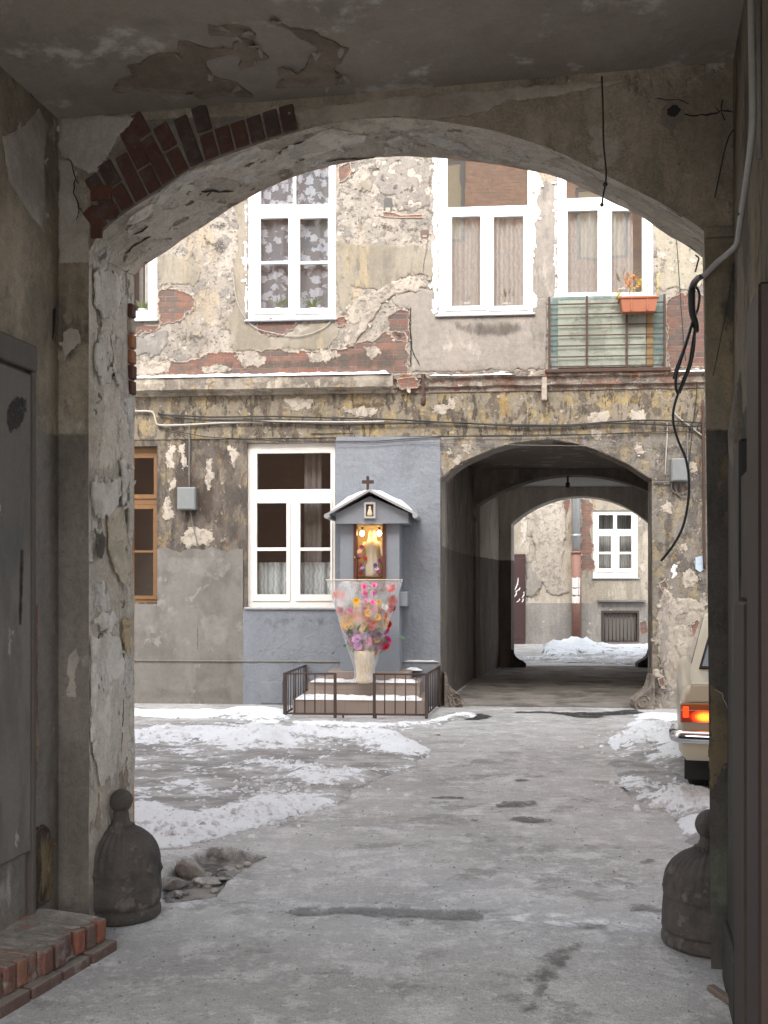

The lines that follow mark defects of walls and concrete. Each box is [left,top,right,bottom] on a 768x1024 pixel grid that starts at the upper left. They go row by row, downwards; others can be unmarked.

crack [69,159,83,220]
flaking render [2,20,638,395]
peeling [91,457,136,585]
peeling [162,443,188,523]
leakage [173,476,212,514]
peeling [180,526,215,549]
peeling [204,458,215,490]
peeling [227,443,240,468]
spalling [639,564,708,709]
peeling [66,610,133,787]